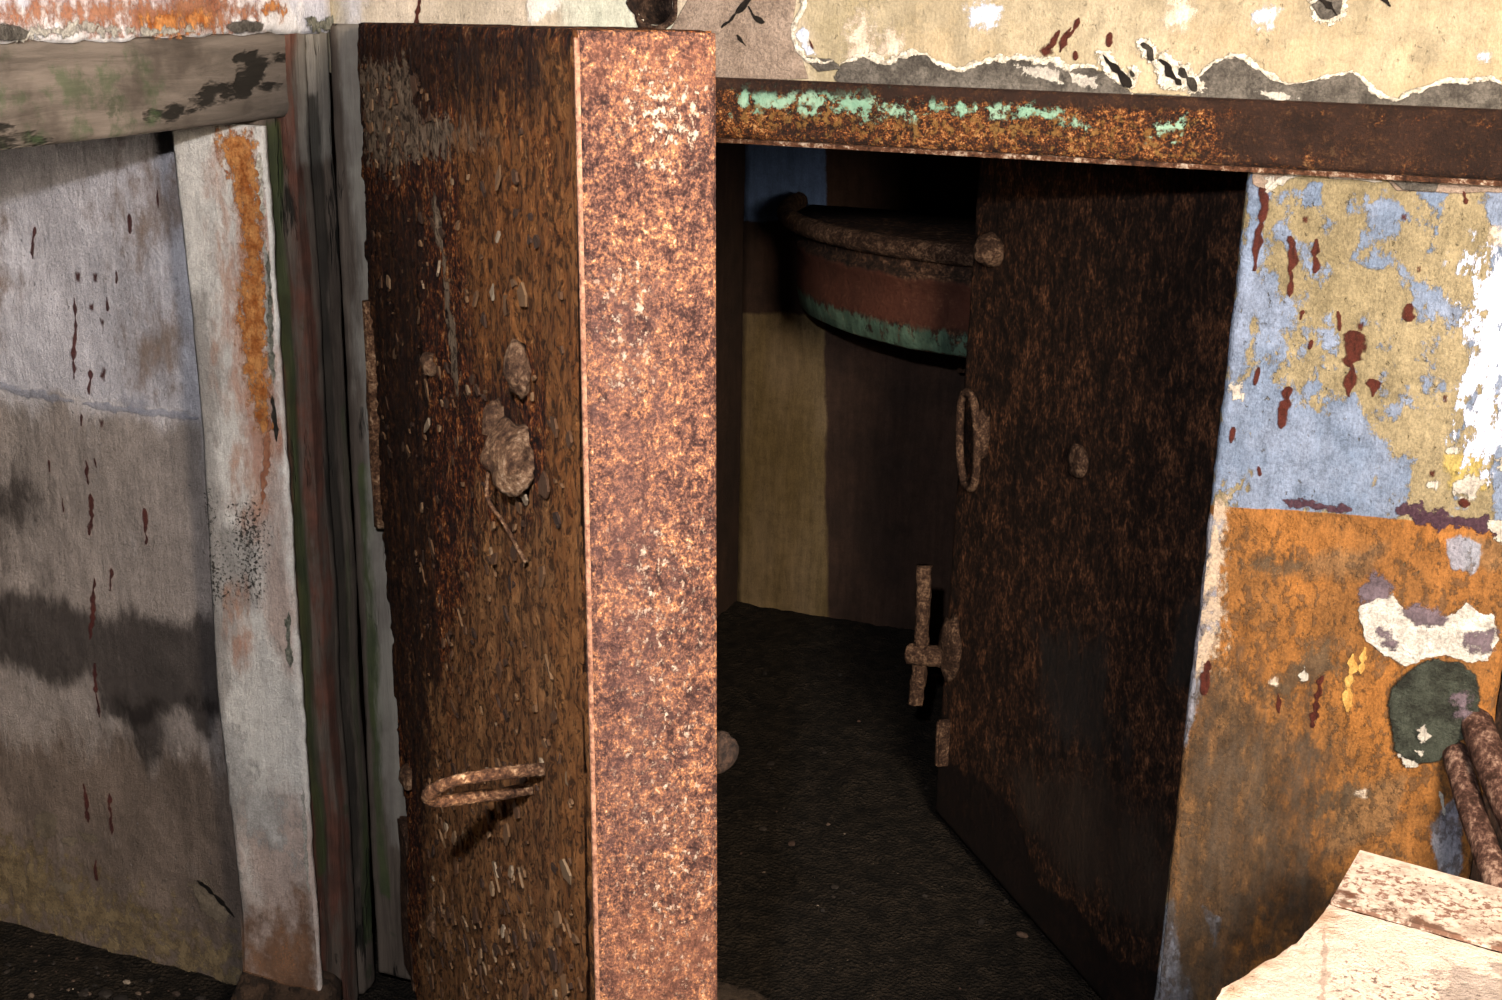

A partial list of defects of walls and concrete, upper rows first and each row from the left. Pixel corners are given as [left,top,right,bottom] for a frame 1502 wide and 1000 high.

corrosion [0,0,288,39]
spalling [626,0,1502,109]
spalling [1252,172,1502,194]
leakage [71,270,118,395]
corrosion [214,126,275,505]
peeling [1426,227,1502,501]
leakage [84,458,97,535]
peeling [1487,520,1502,545]
leakage [0,488,273,763]
corrosion [414,471,574,809]
peeling [1342,571,1501,712]
corrosion [418,748,584,1000]